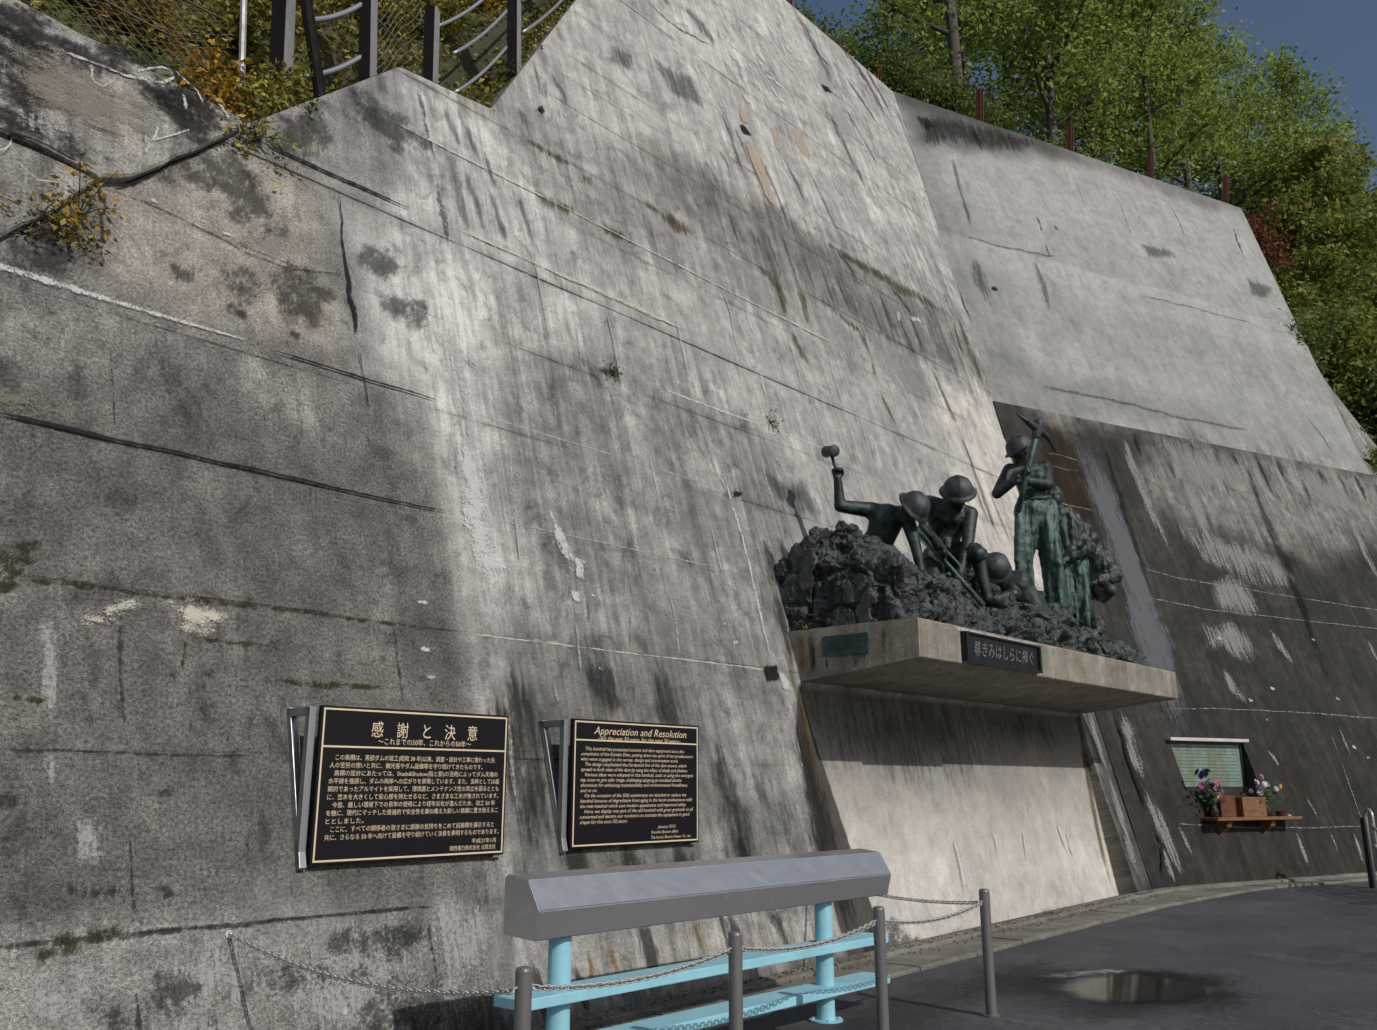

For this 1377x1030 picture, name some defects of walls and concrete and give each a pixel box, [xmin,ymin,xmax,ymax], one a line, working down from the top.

crack [0,44,436,406]